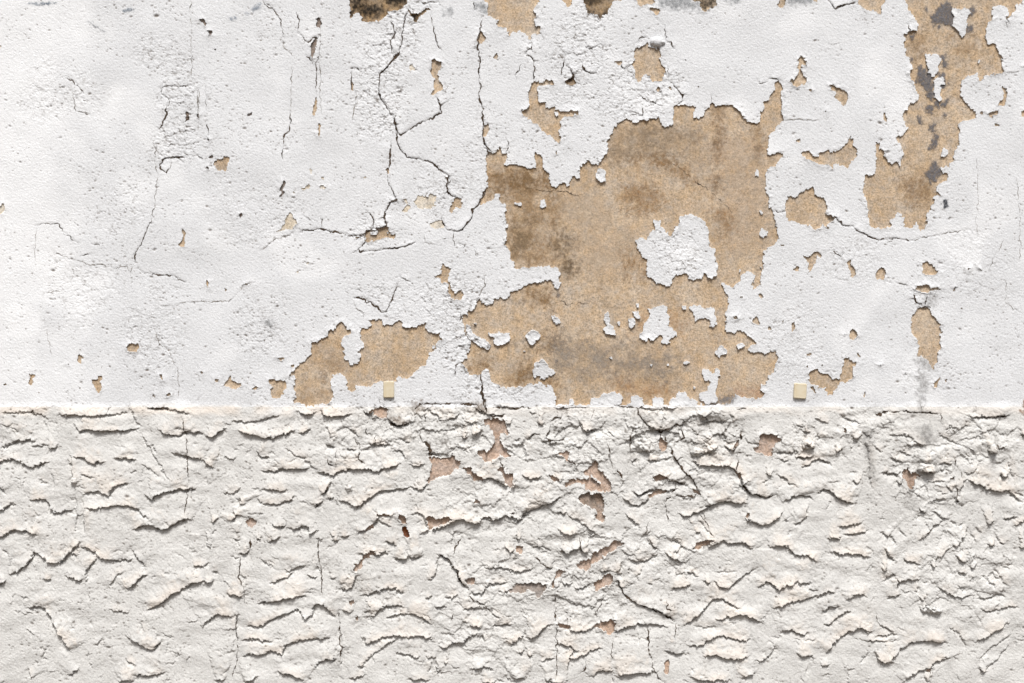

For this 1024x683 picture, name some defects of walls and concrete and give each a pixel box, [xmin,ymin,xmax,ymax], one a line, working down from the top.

peeling [484,0,541,39]
crack [263,1,486,256]
crack [473,3,509,154]
peeling [858,0,1022,231]
peeling [461,56,837,408]
peeling [215,318,442,407]
peeling [911,307,947,387]
crack [315,363,714,549]
flaking render [549,450,622,522]
crack [705,403,776,498]
crack [876,404,1008,502]
crack [595,581,677,679]